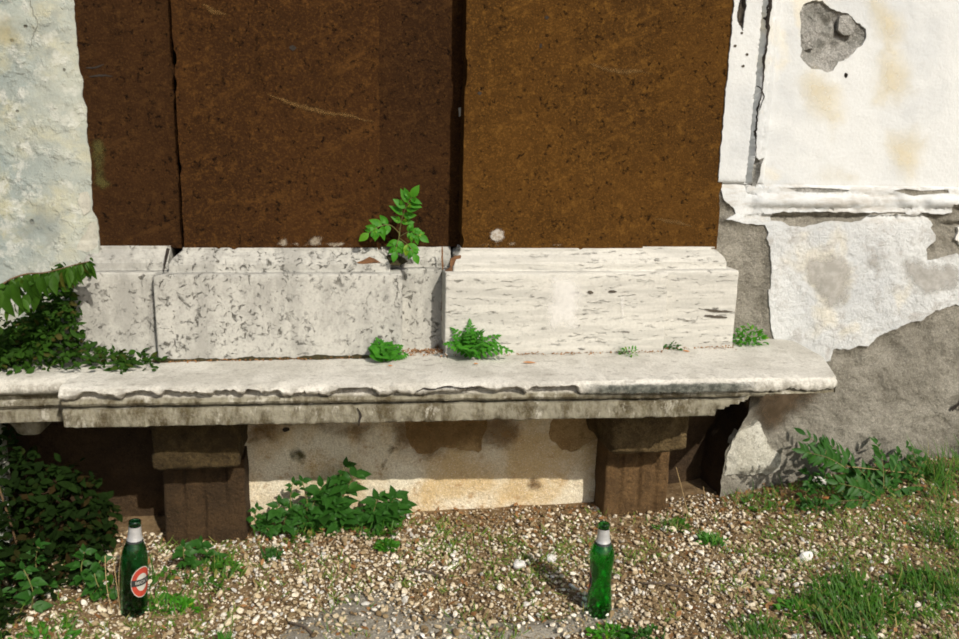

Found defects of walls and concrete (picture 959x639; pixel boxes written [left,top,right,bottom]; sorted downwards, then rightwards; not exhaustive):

crack [737,0,772,152]
flaking render [799,0,865,78]
flaking render [920,204,959,260]
flaking render [720,304,959,497]